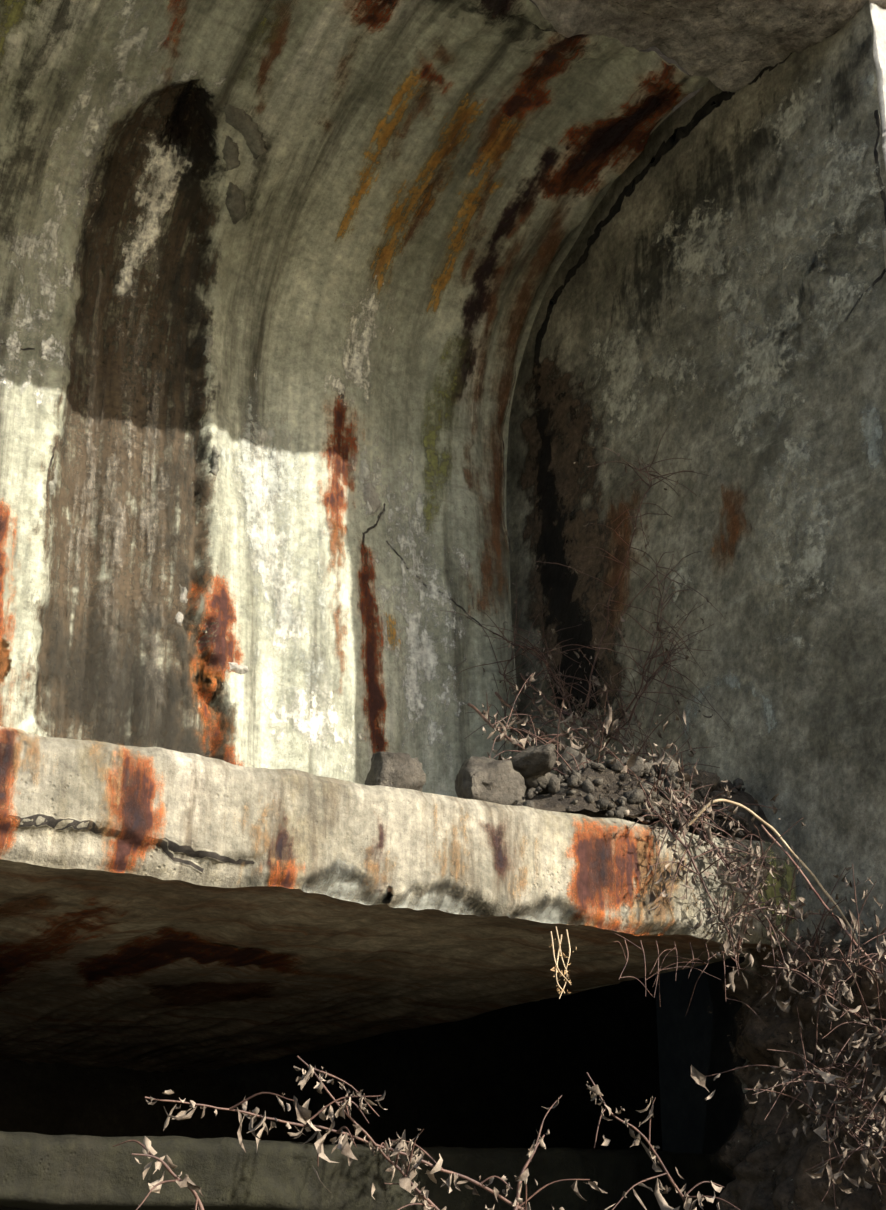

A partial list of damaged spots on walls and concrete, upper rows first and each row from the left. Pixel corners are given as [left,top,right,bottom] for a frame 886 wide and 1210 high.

corrosion [256,3,290,112]
corrosion [348,0,397,32]
crack [873,109,886,227]
leakage [0,0,307,762]
corrosion [321,34,685,613]
crack [844,267,886,323]
corrosion [0,503,40,856]
corrosion [175,575,248,766]
corrosion [333,592,348,672]
corrosion [90,742,164,873]
crack [12,813,255,874]
corrosion [567,820,687,936]